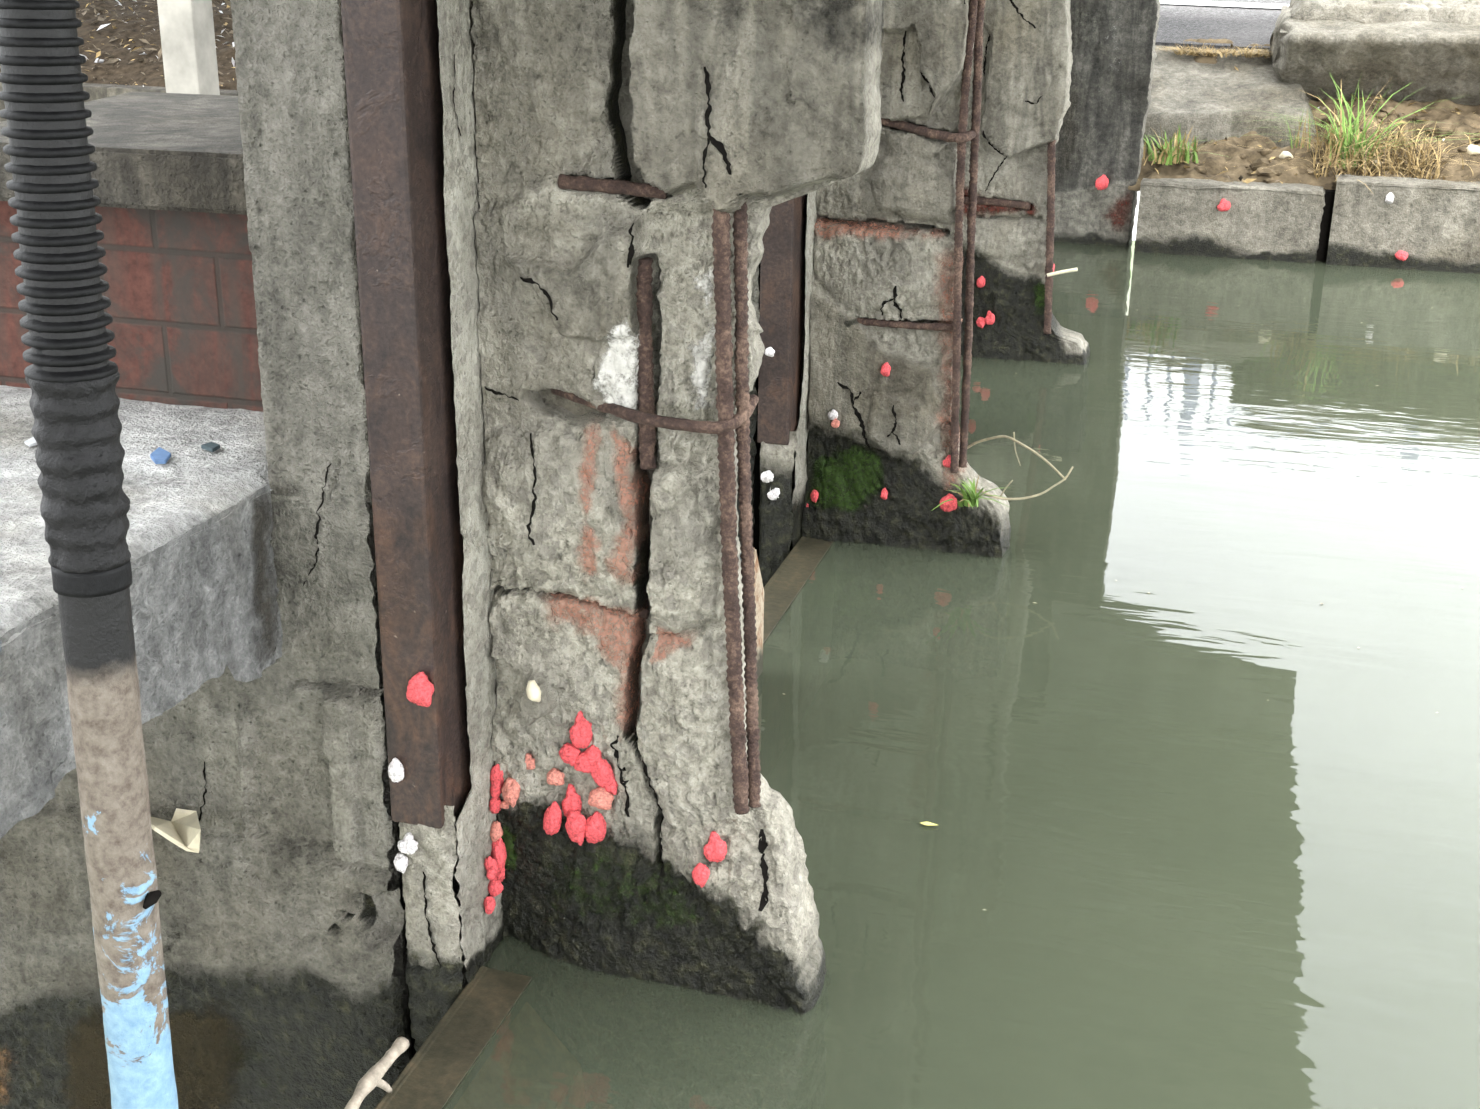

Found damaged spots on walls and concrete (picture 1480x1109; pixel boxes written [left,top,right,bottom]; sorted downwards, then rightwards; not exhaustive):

crack [899,31,935,102]
crack [983,0,1036,76]
crack [702,67,732,188]
corrosion [814,218,943,239]
spalling [811,0,1056,473]
corrosion [963,187,1036,215]
spalling [471,0,791,846]
crack [423,872,441,968]
leakage [62,1012,112,1109]
leakage [169,1008,243,1109]